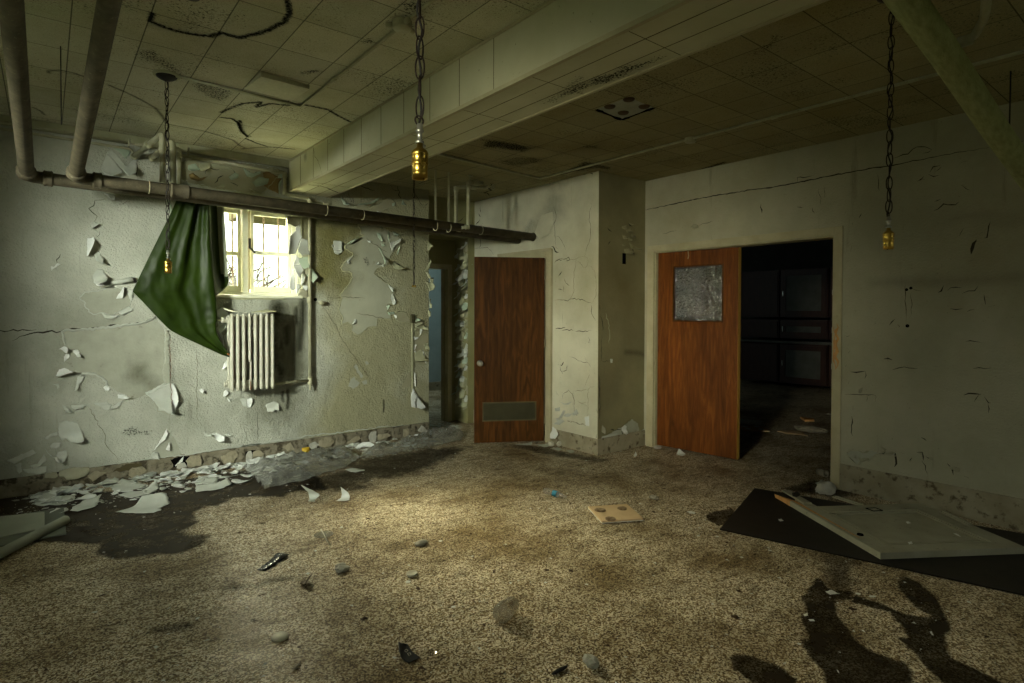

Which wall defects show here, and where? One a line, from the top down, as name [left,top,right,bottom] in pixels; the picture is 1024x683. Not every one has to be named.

peeling [86,221,101,257]
peeling [101,144,137,179]
peeling [181,158,282,196]
crack [647,146,990,261]
crack [0,316,156,341]
peeling [216,214,435,409]
peeling [451,242,468,410]
crack [552,204,606,437]
peeling [7,269,428,513]